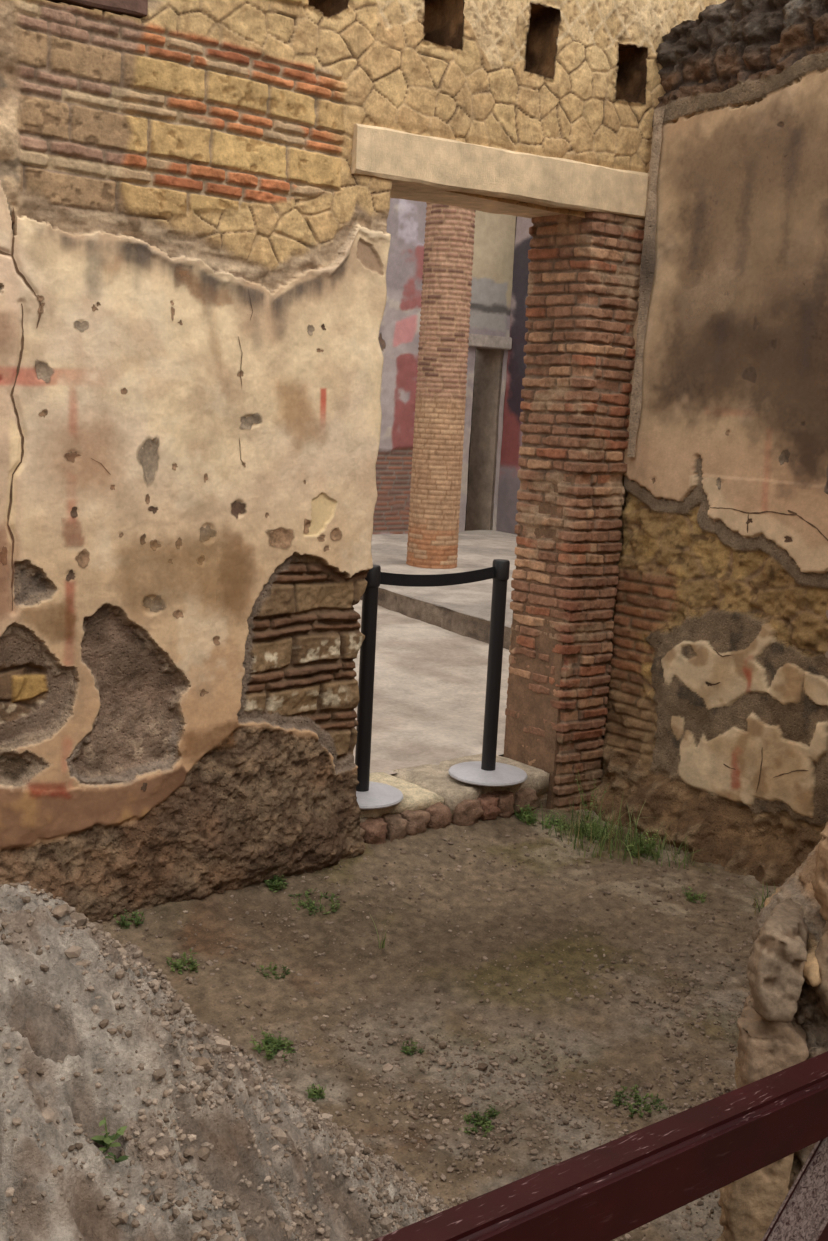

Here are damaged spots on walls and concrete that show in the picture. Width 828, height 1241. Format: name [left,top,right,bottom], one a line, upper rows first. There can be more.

peeling [357,237,385,275]
crack [0,208,42,611]
spalling [138,437,178,514]
flaking render [624,455,828,590]
crack [709,507,828,541]
flaking render [0,547,90,606]
flaking render [0,603,209,791]
spalling [144,596,183,619]
flaking render [237,492,372,773]
peeling [661,623,828,710]
peeling [672,712,828,817]